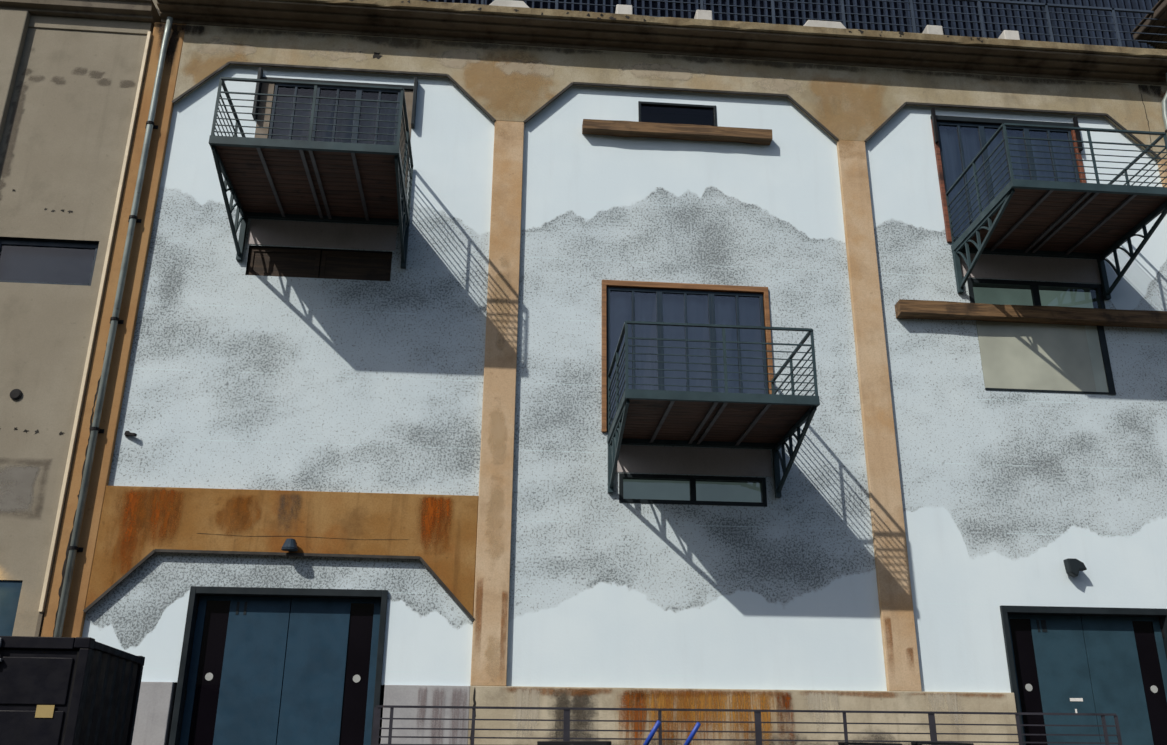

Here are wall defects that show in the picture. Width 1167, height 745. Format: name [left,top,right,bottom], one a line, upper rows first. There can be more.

rust [121,490,181,568]
rust [421,497,450,544]
crack [469,688,477,744]
rust [623,691,794,745]